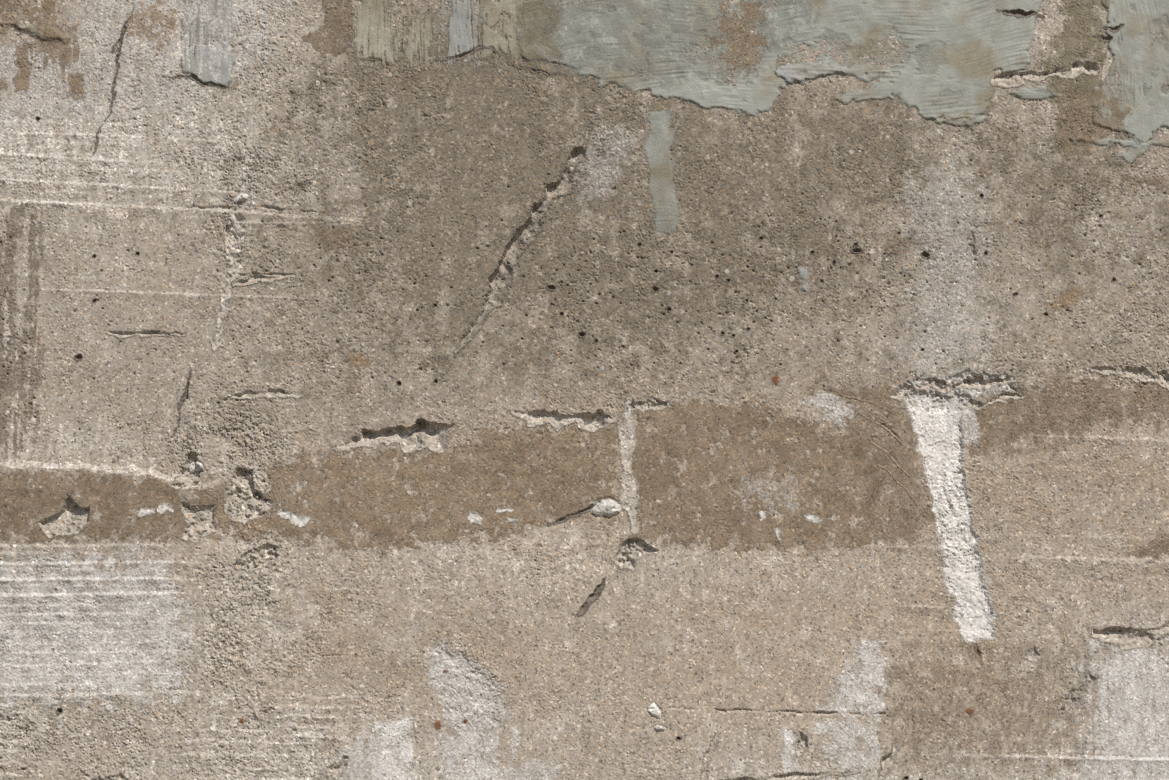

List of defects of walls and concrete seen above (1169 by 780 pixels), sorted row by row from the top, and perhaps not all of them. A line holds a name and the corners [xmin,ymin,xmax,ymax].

crack [93,6,135,154]
peeling [352,0,1169,163]
crack [1090,365,1169,391]
spalling [332,419,456,453]
spalling [38,495,91,538]
spalling [511,395,674,571]
spalling [887,368,1026,643]
crack [576,577,606,616]
crack [701,732,720,780]